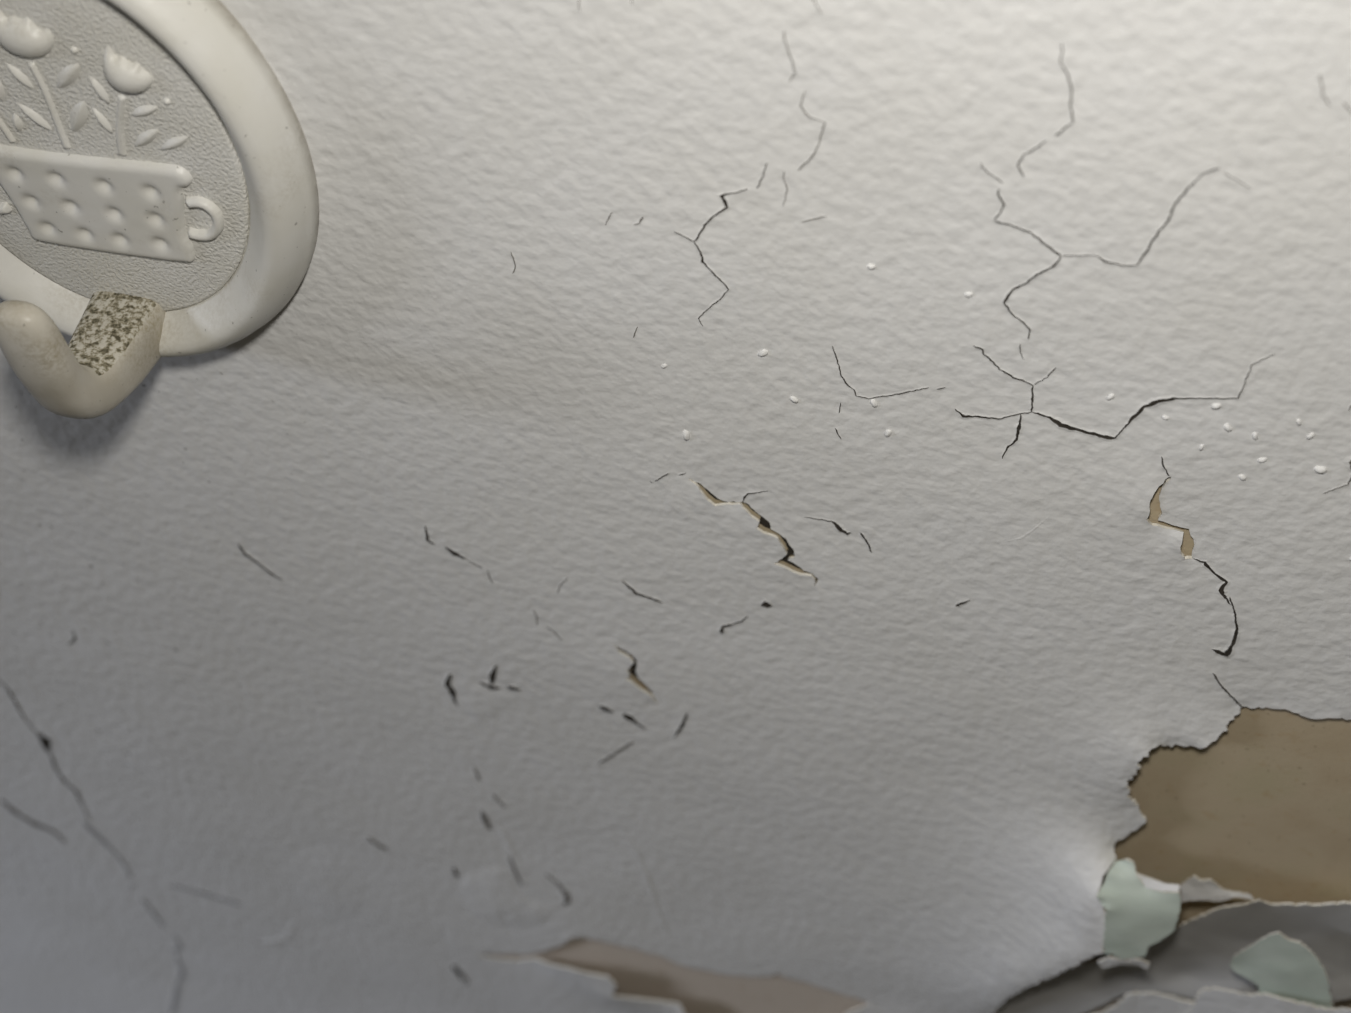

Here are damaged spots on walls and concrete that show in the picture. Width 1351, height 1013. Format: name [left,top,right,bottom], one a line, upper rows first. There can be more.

crack [604,30,828,326]
crack [831,43,1275,459]
crack [423,525,495,584]
crack [717,597,772,634]
crack [649,472,873,581]
crack [1149,456,1244,708]
crack [441,664,521,707]
crack [629,658,643,683]
crack [597,704,690,765]
crack [0,679,241,1013]
peeling [995,707,1351,1013]
peeling [540,937,864,1013]